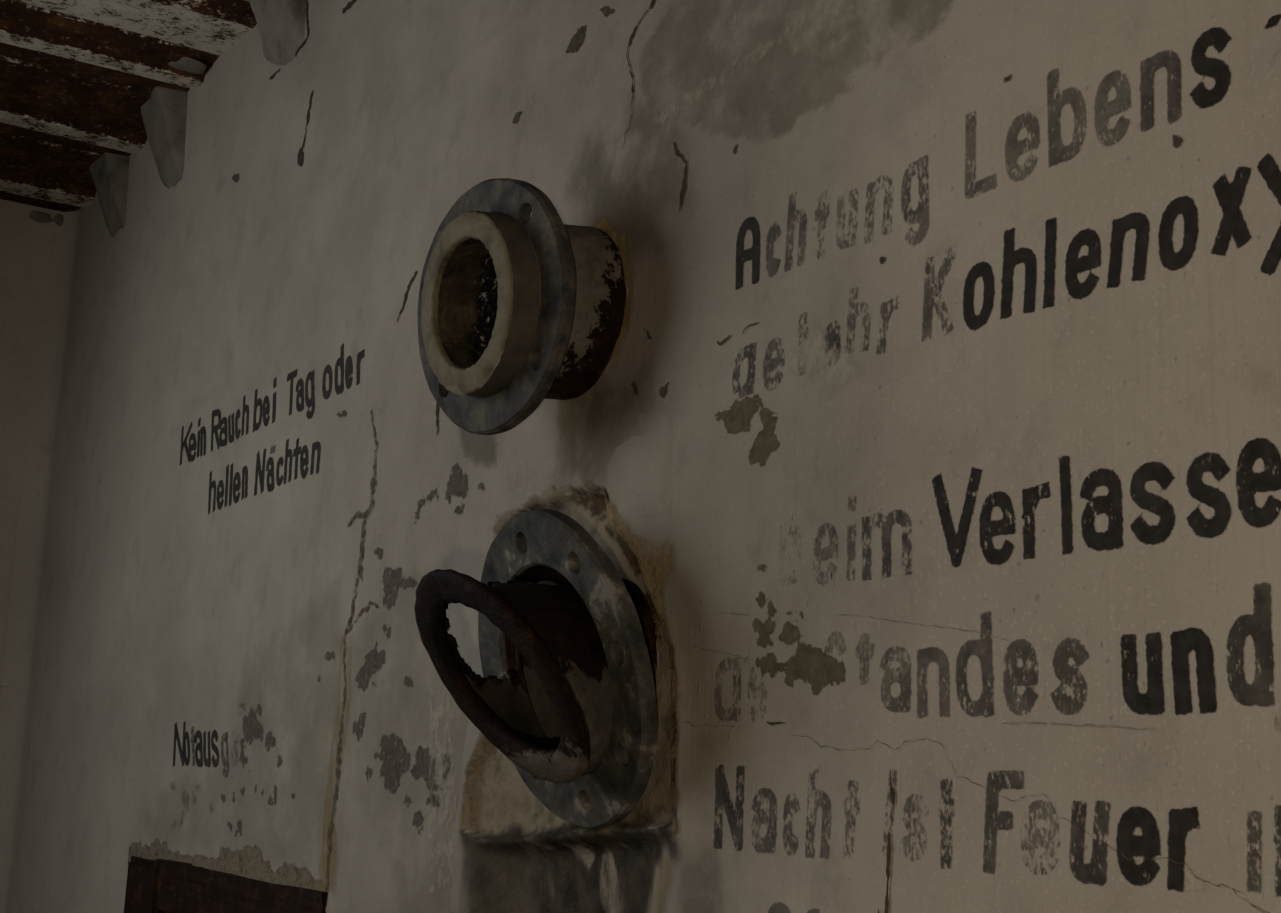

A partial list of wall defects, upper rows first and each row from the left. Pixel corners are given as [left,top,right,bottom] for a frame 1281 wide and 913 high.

crack [622,0,655,147]
crack [673,142,687,210]
peeling [715,394,779,466]
peeling [415,463,484,519]
peeling [374,547,417,609]
crack [325,411,378,892]
peeling [356,625,390,691]
peeling [459,482,678,846]
peeling [752,591,845,695]
flaking render [352,712,365,742]
crack [794,735,944,751]
peeling [365,733,451,835]